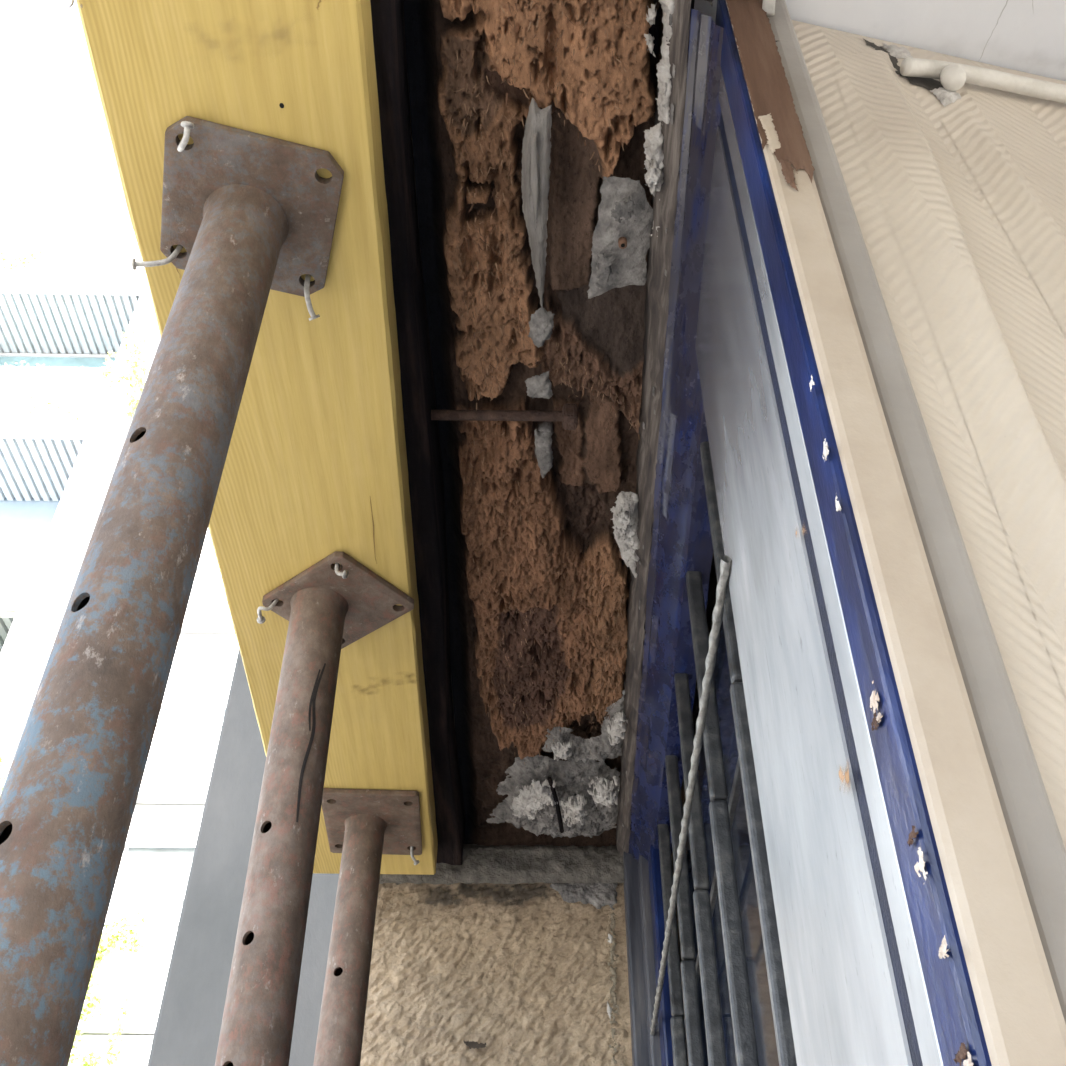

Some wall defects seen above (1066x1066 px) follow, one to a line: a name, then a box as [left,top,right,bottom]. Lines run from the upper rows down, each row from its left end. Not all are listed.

peeling [726,0,815,191]
spalling [864,39,961,107]
spalling [587,0,675,299]
flaking render [527,307,555,348]
flaking render [525,371,553,399]
flaking render [534,429,553,478]
spalling [610,491,644,578]
peeling [870,681,882,731]
spalling [486,690,628,838]
peeling [907,826,928,884]
peeling [938,935,949,959]
peeling [953,1043,973,1066]